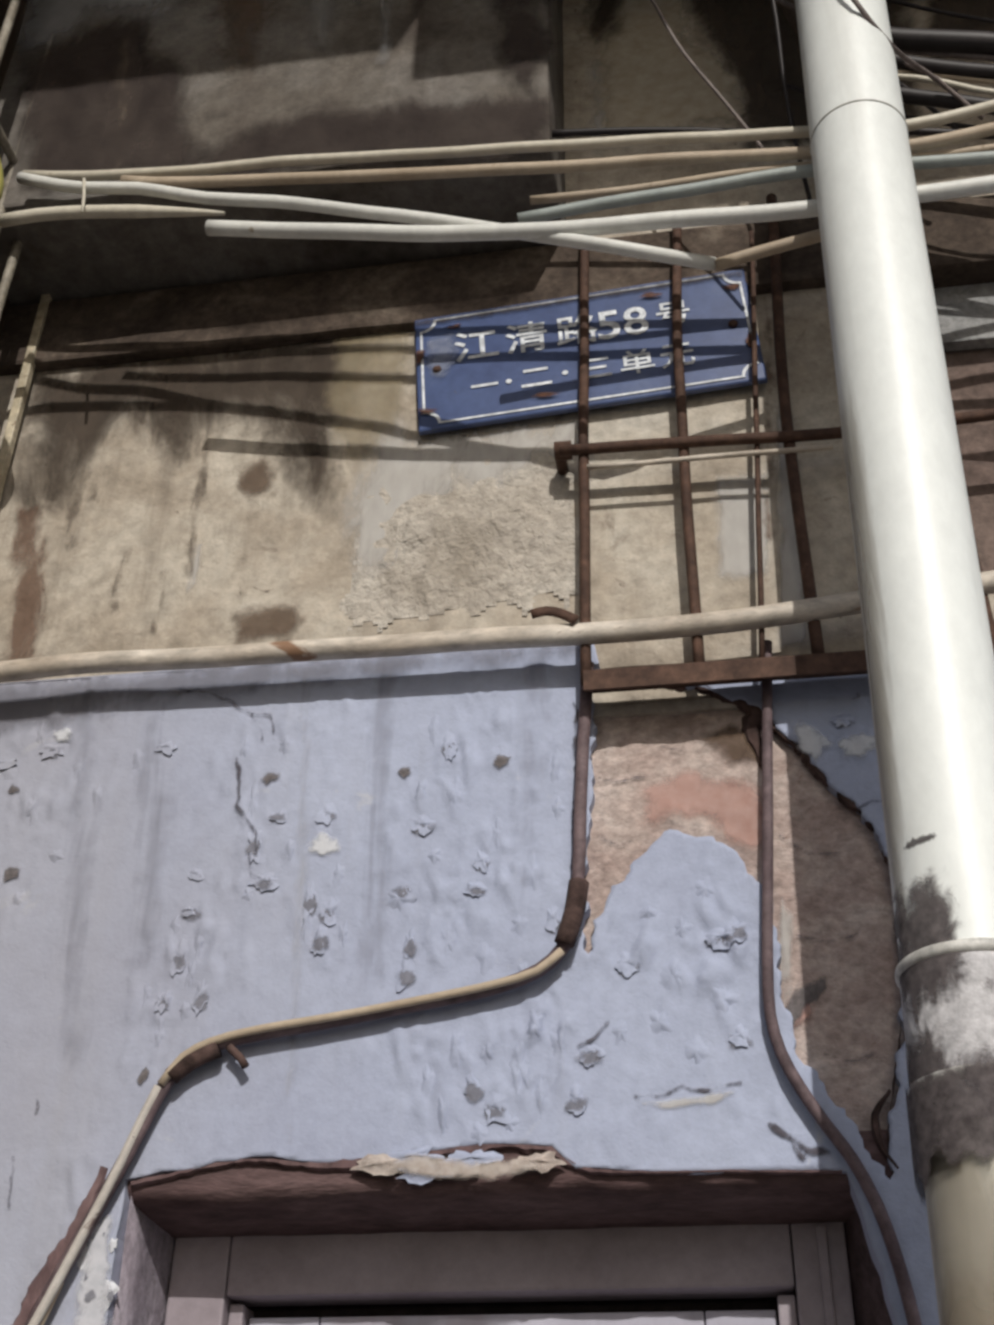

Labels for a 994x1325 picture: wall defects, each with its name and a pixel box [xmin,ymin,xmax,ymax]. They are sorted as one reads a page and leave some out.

leakage [19,0,552,175]
leakage [593,0,746,137]
leakage [239,460,271,492]
leakage [235,607,302,640]
flaking render [583,710,905,1131]
spalling [131,1144,842,1188]
peeling [75,1217,120,1325]